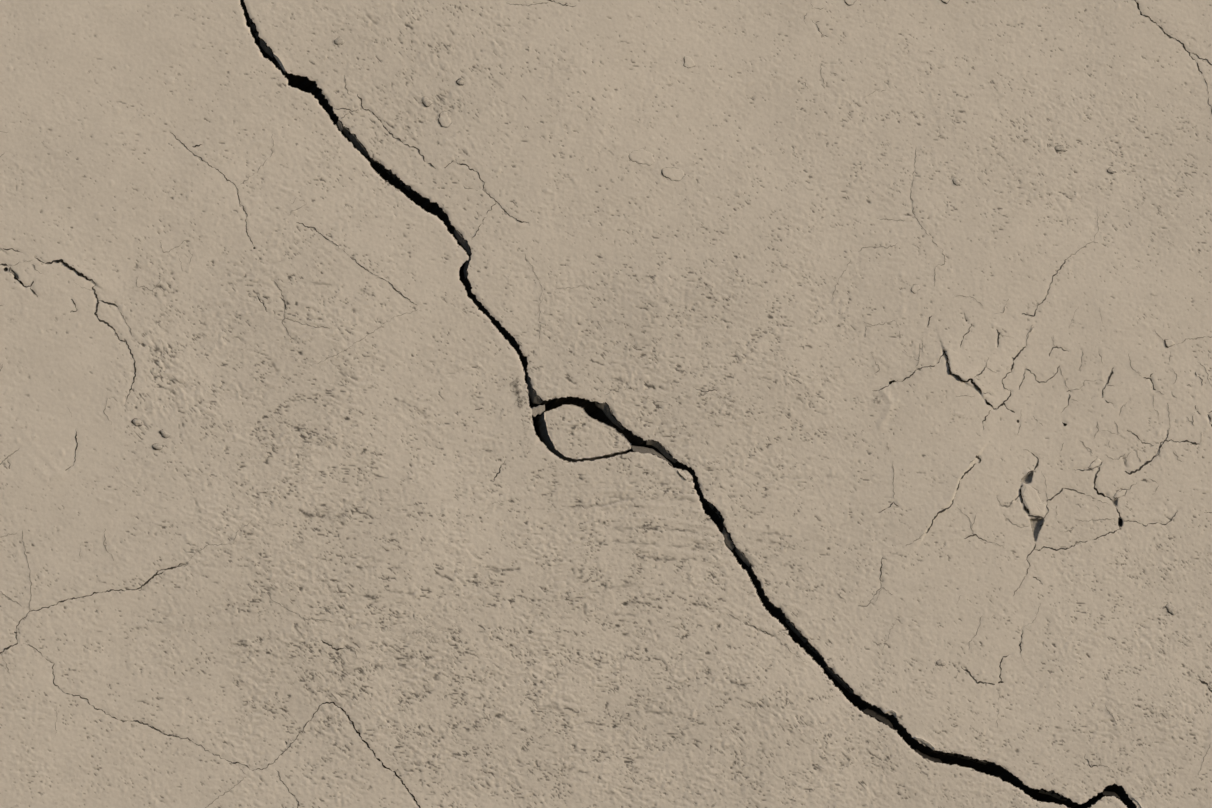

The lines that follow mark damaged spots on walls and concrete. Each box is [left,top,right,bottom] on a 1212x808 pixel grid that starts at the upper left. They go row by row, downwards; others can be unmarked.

crack [0,240,193,423]
crack [170,132,274,248]
crack [240,0,1142,808]
crack [833,150,1212,724]
crack [1135,0,1212,112]
crack [0,520,421,808]